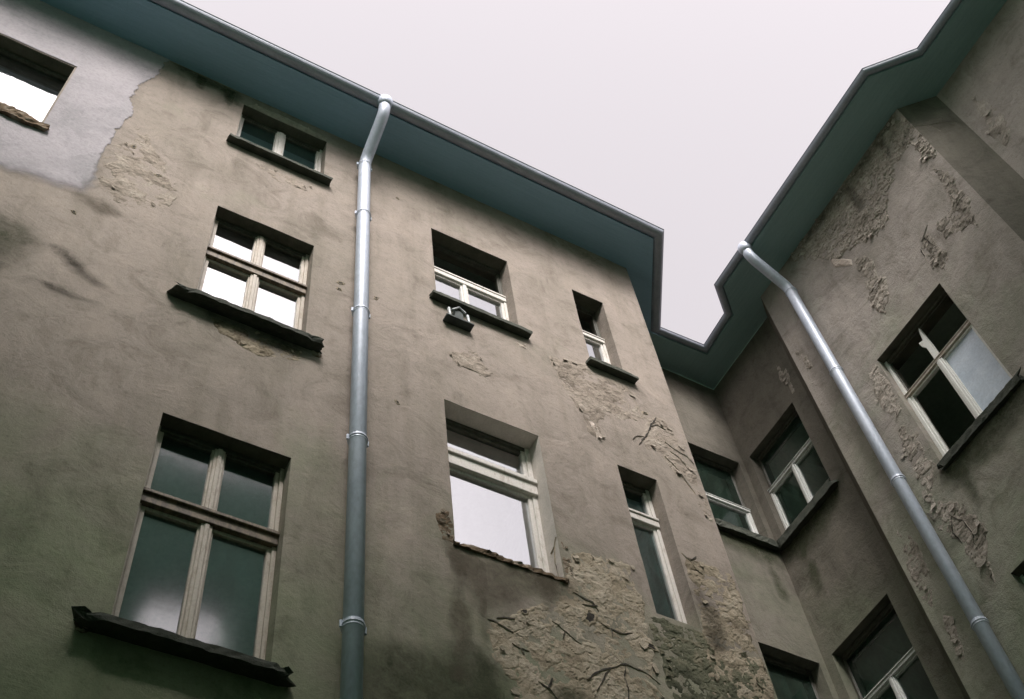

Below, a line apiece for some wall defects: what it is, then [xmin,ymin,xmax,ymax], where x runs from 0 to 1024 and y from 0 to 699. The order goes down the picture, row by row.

flaking render [98,127,177,208]
flaking render [790,113,977,314]
flaking render [436,509,454,544]
flaking render [449,351,493,378]
flaking render [549,356,714,522]
crack [633,418,696,494]
flaking render [868,364,996,583]
flaking render [486,542,775,699]